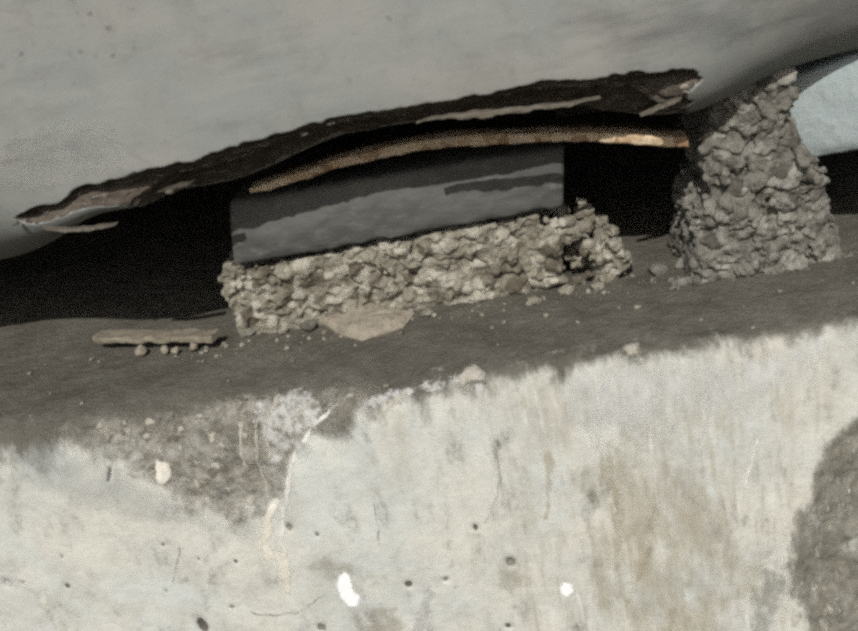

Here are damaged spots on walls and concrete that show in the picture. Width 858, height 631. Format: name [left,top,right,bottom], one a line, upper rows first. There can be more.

spalling [12,69,701,233]
spalling [80,386,354,523]